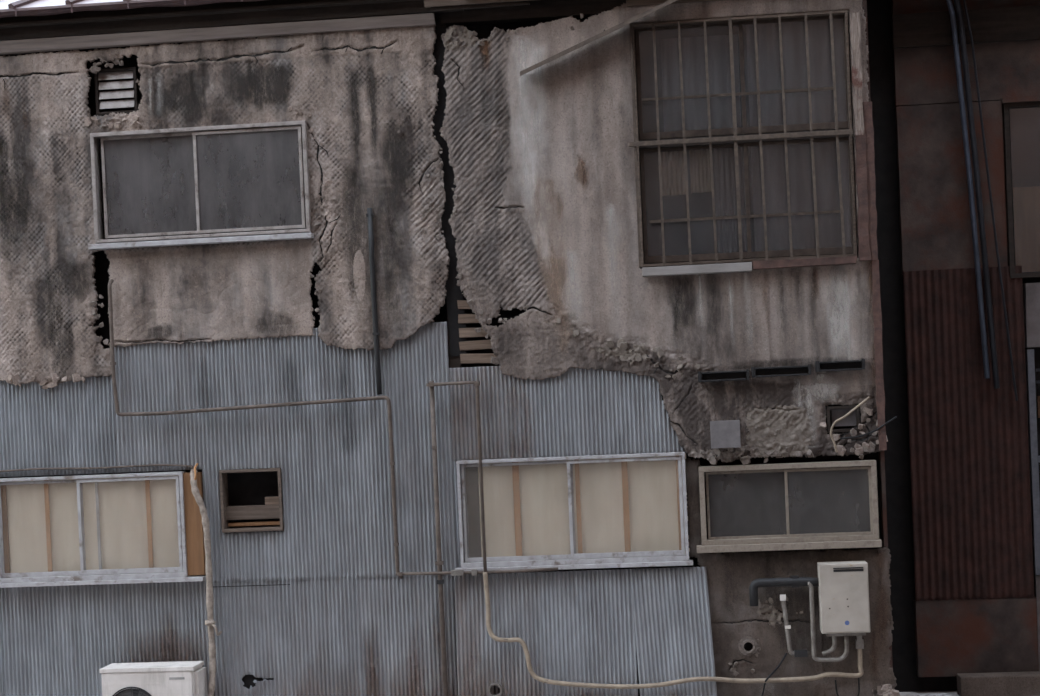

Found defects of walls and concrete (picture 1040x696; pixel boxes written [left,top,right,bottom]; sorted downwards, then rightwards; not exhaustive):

spalling [443,26,485,51]
peeling [89,57,124,74]
leakage [231,61,289,108]
spalling [84,115,142,131]
crack [418,26,467,356]
peeling [91,294,109,345]
spalling [594,338,700,380]
spalling [819,391,888,459]
spalling [690,445,814,465]